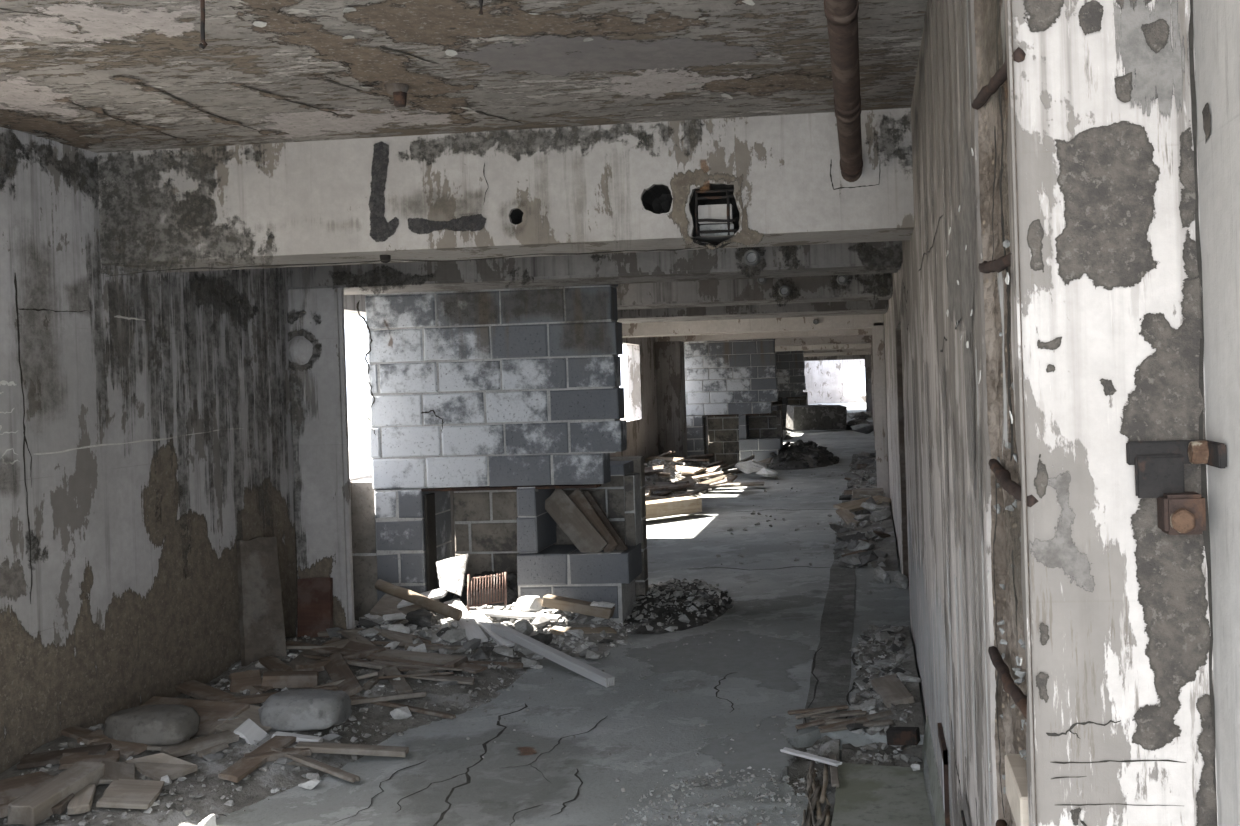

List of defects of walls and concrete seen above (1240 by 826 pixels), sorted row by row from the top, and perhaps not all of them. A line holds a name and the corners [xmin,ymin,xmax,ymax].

peeling [0,75,107,149]
peeling [0,0,213,48]
peeling [228,0,833,139]
water stain [0,129,321,618]
spalling [946,0,1211,826]
peeling [141,434,182,548]
corrosion [988,458,1038,507]
peeling [0,555,30,601]
crack [714,672,737,712]
corrosion [988,646,1027,720]
crack [335,704,607,826]
peeling [1196,694,1217,826]